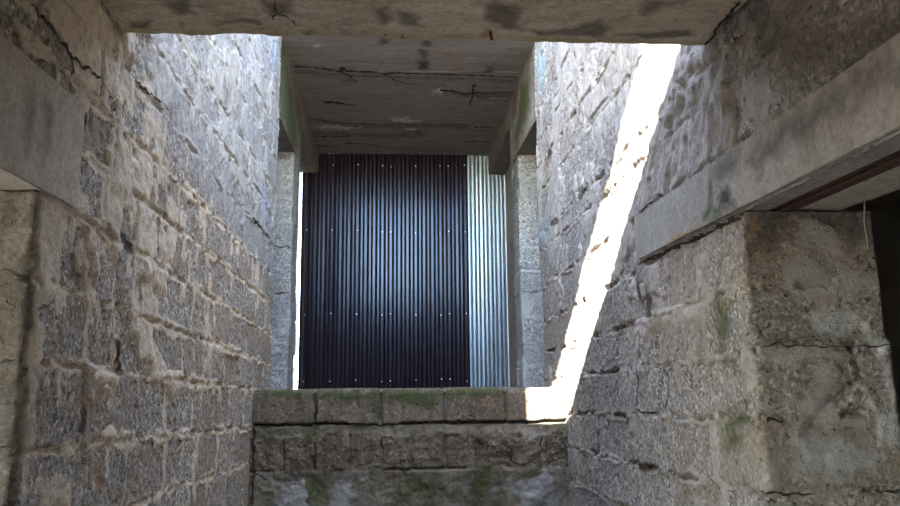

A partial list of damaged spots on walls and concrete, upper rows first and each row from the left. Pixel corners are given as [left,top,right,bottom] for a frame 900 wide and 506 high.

leakage [363,0,435,31]
leakage [476,0,702,40]
crack [704,2,741,45]
crack [30,4,111,103]
crack [294,65,518,147]
crack [762,341,892,349]